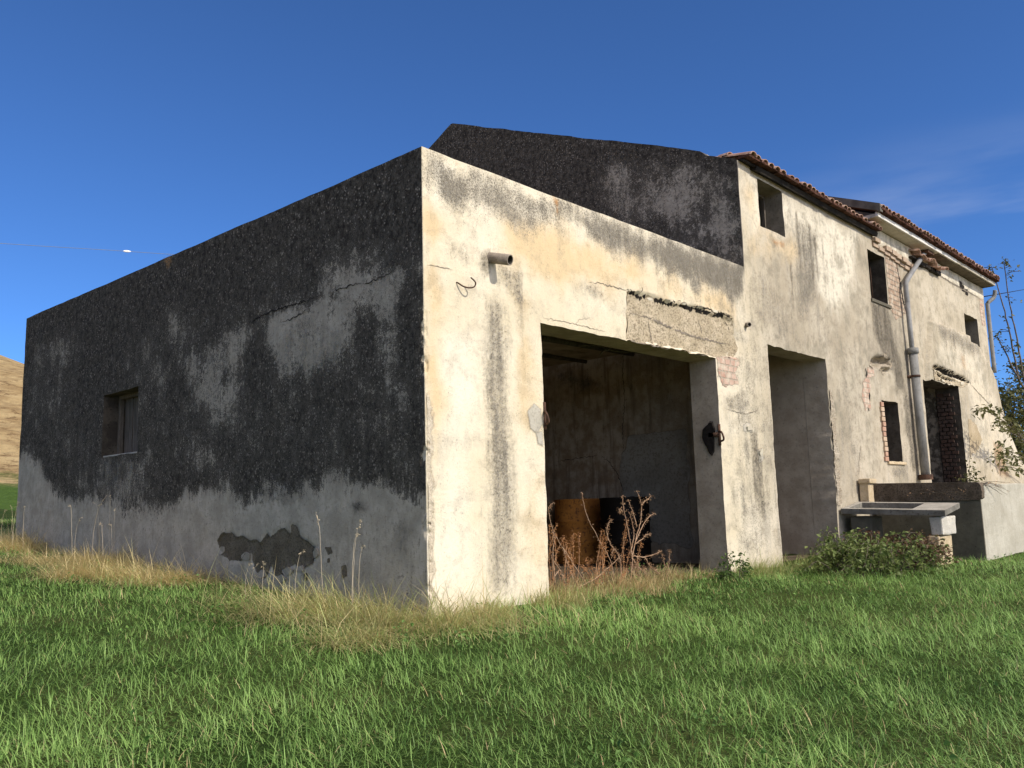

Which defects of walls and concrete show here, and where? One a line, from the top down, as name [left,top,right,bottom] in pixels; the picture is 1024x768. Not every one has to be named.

crack [248,271,392,324]
flaking render [885,249,949,320]
spalling [625,291,740,387]
flaking render [862,353,892,410]
spalling [932,367,968,388]
damp [481,252,522,593]
peeling [528,404,543,446]
peeling [217,524,347,583]